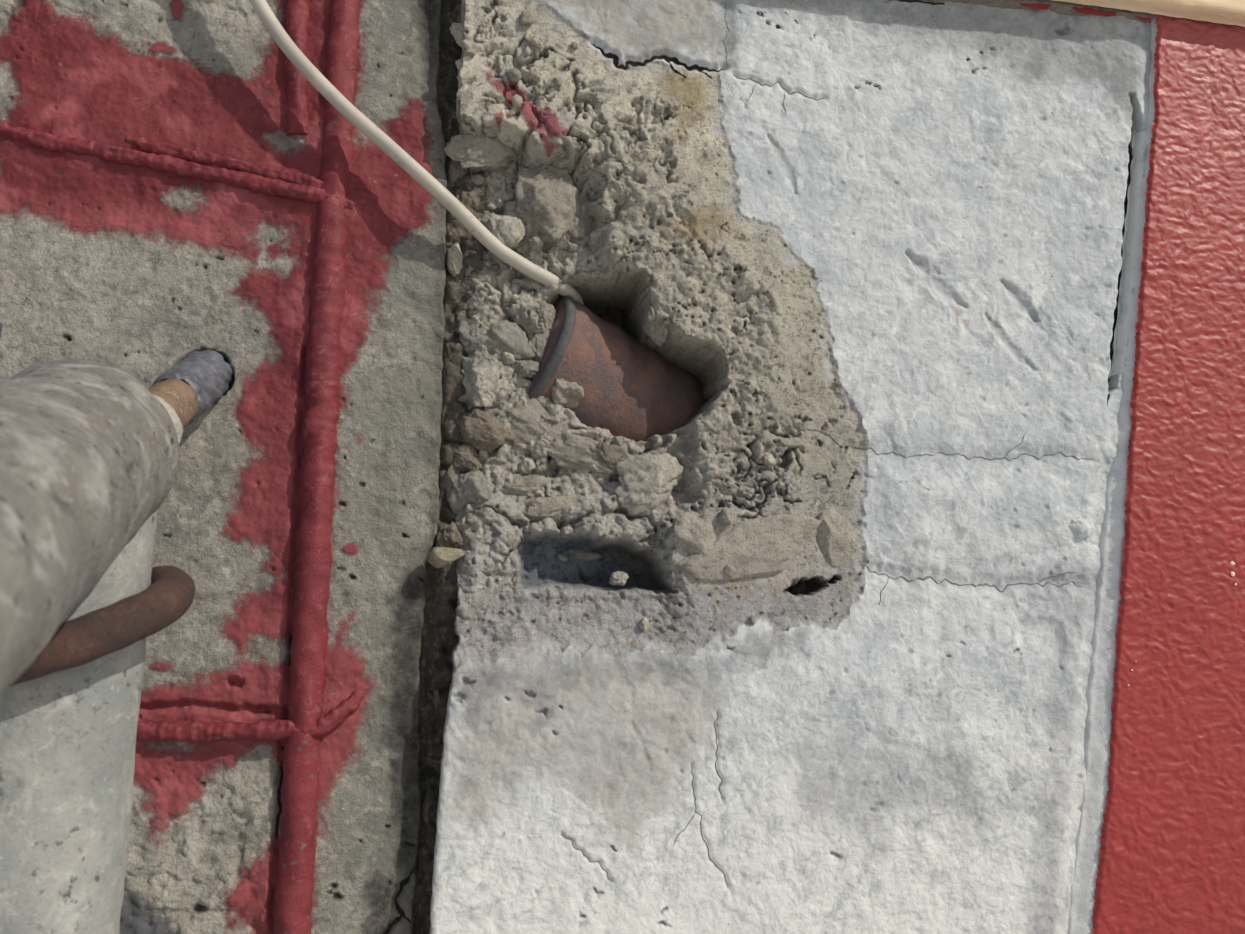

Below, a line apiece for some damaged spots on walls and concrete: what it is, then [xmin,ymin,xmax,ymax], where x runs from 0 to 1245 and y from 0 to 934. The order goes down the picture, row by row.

crack [593,3,825,111]
crack [888,0,945,8]
crack [1107,127,1133,405]
crack [383,0,485,934]
spalling [0,0,869,934]
crack [809,429,1092,461]
crack [864,564,1081,604]